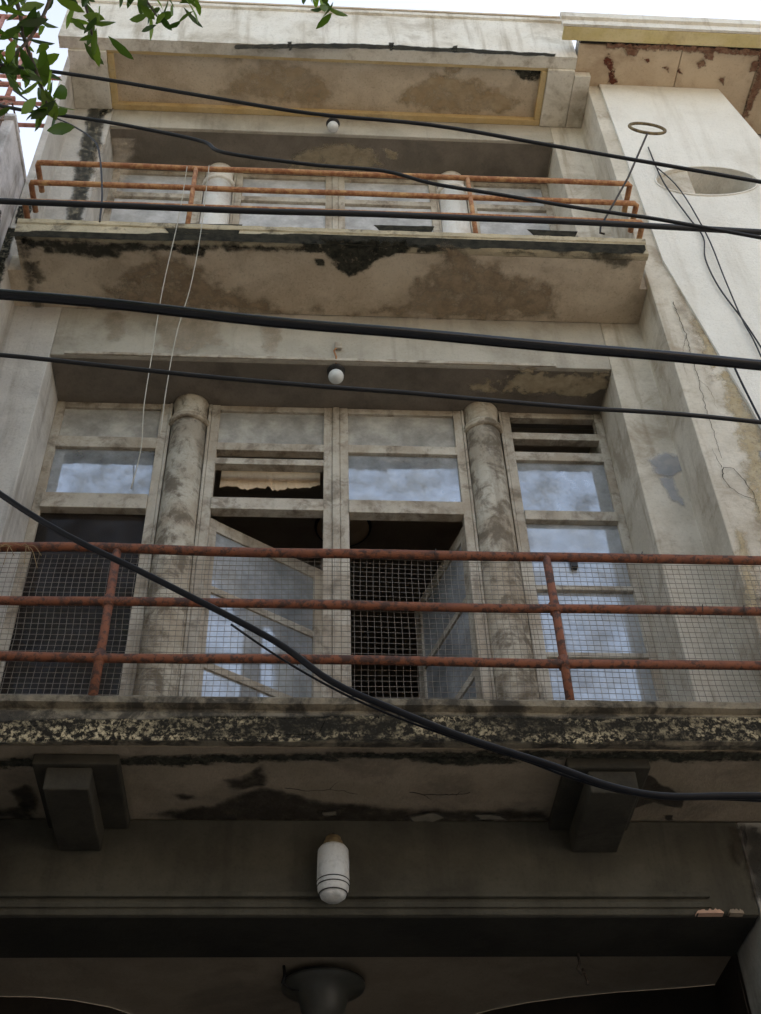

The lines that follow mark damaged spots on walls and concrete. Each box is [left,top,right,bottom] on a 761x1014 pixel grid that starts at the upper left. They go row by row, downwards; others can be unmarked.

rust [606,43,761,119]
leakage [9,223,646,321]
peeling [469,368,611,397]
crack [673,302,760,513]
leakage [0,758,33,769]